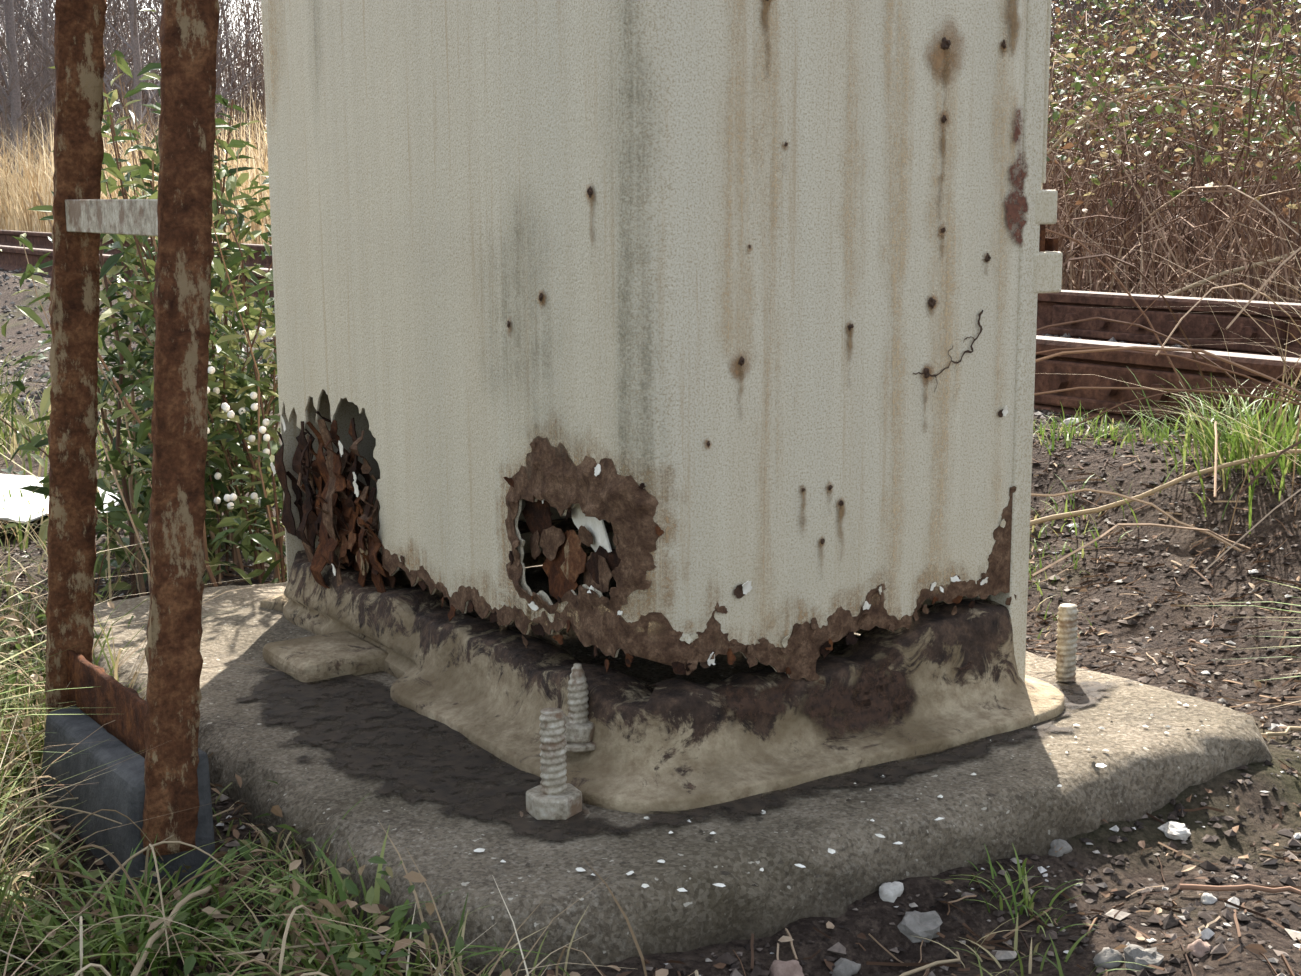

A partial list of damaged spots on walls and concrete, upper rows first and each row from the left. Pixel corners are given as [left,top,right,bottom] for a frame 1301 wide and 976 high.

leakage [236,666,1133,841]